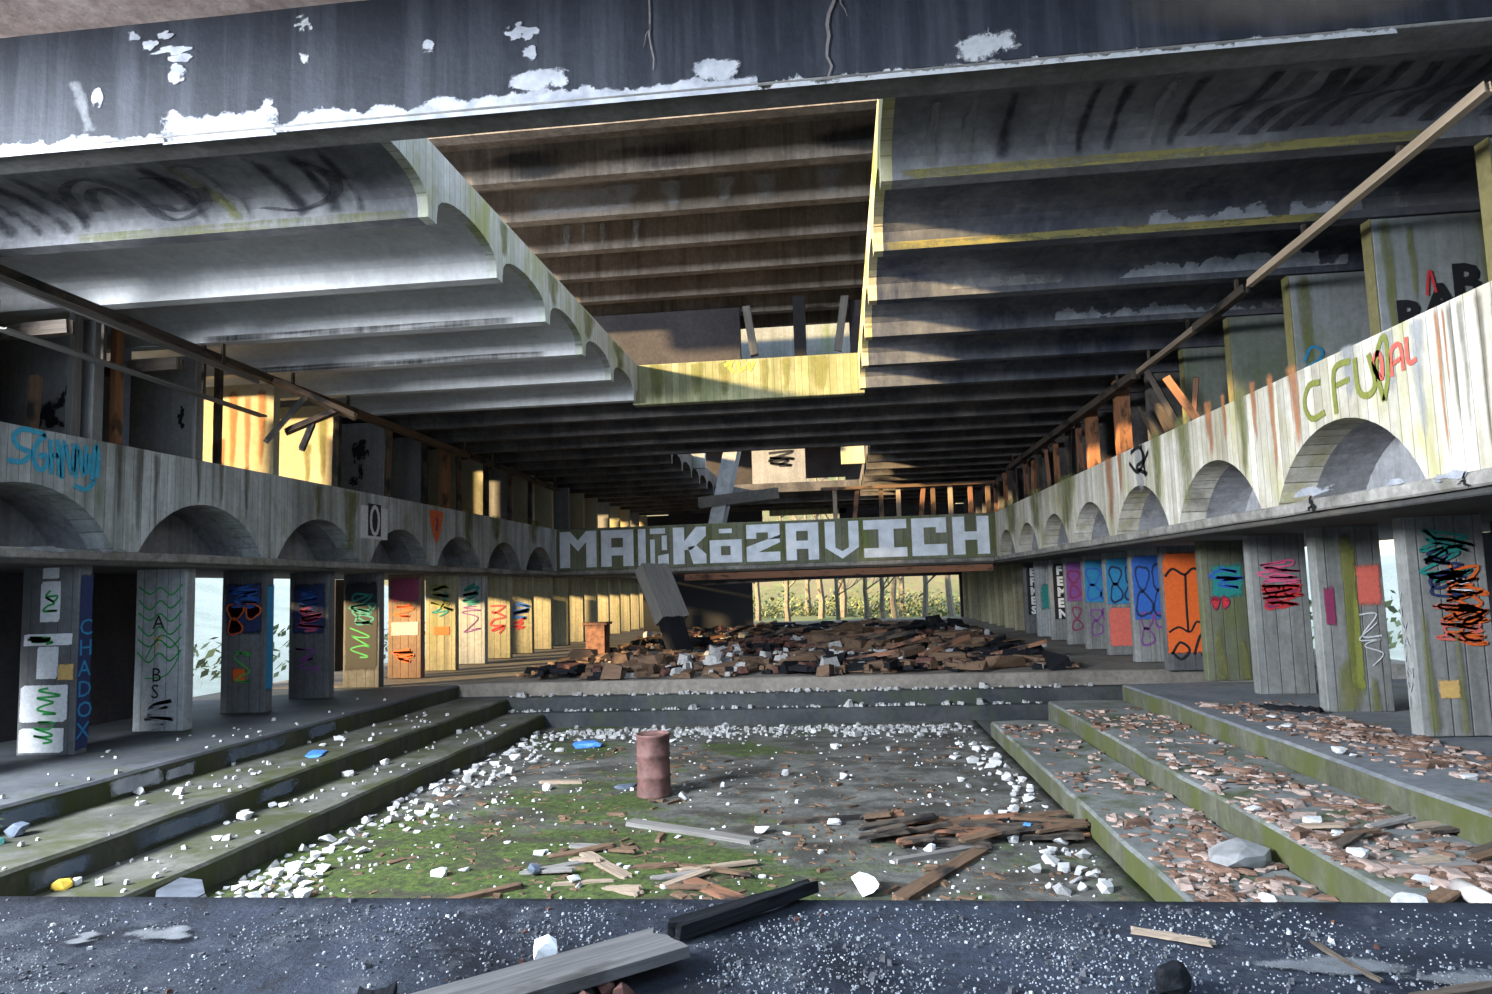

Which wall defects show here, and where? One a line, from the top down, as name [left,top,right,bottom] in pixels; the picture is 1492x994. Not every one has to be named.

peeling [294,15,313,31]
crack [825,0,847,76]
peeling [0,21,1397,157]
peeling [1196,59,1492,135]
peeling [0,182,89,235]
peeling [140,167,249,218]
peeling [252,162,306,214]
peeling [293,156,361,210]
leakage [1447,218,1492,347]
leakage [119,446,158,510]